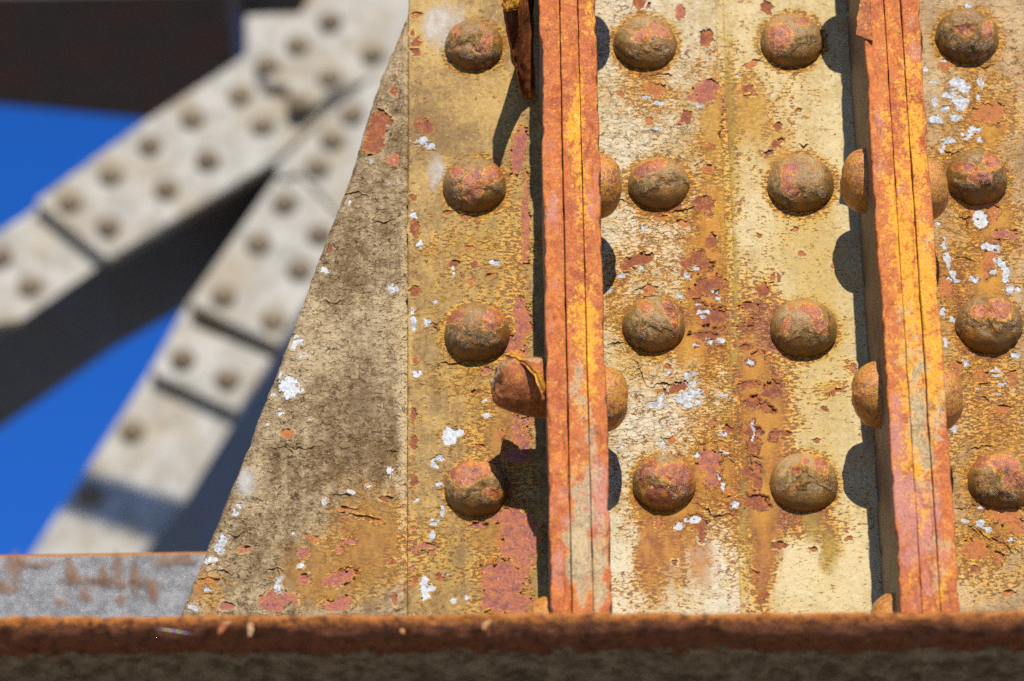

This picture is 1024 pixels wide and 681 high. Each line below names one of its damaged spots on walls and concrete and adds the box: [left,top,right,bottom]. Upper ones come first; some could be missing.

rust [856,0,873,42]
rust [362,10,460,167]
peeling [923,56,986,155]
peeling [933,208,1023,296]
rust [503,293,546,403]
peeling [645,368,735,411]
rust [639,185,794,602]
peeling [347,464,396,497]
rust [470,409,538,469]
peeling [204,533,231,567]
peeling [273,560,306,596]
rust [468,499,548,636]